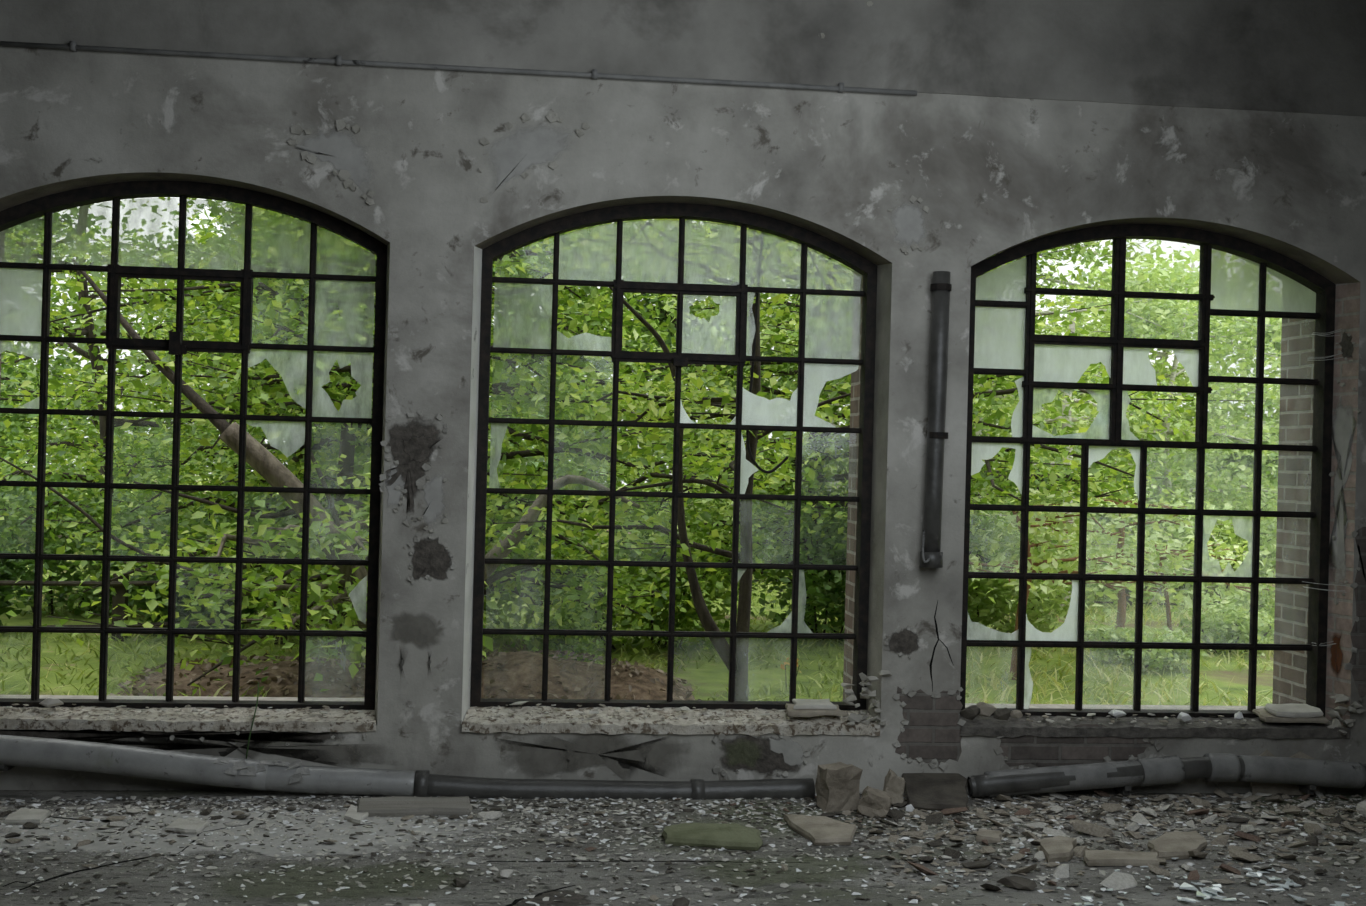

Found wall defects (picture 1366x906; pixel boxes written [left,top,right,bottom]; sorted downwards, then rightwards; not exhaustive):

leakage [393,614,439,671]
spalling [884,626,921,658]
flaking render [841,670,966,770]